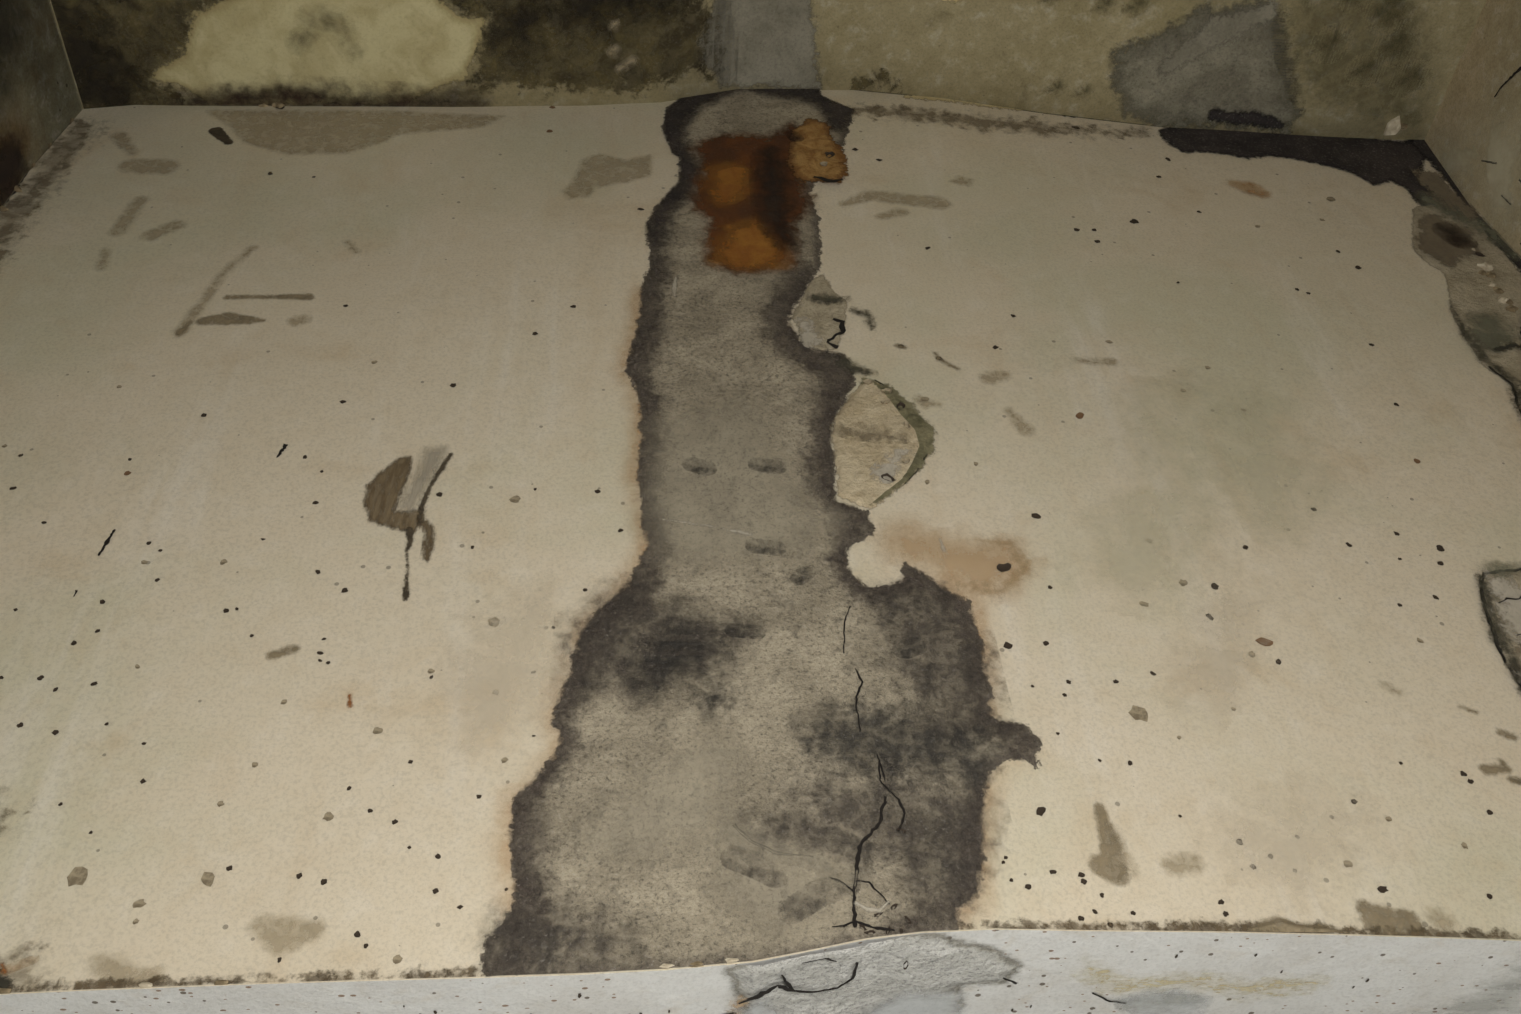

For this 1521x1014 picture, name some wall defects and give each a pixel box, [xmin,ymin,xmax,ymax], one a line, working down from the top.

peeling [151,0,486,109]
water stain [0,0,854,975]
corrosion [692,122,817,274]
spalling [792,275,935,509]
water stain [750,263,1032,928]
water stain [1159,108,1521,273]
peeling [1412,169,1521,413]
peeling [1476,562,1521,690]
crack [738,606,911,1004]
crack [0,969,13,988]